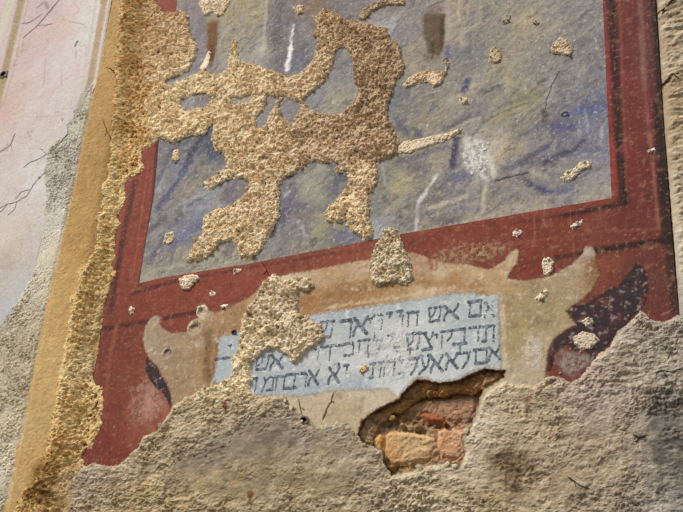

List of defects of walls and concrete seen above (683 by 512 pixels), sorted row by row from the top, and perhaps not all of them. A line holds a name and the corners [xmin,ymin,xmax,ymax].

crack [0,127,68,215]
spalling [0,0,462,512]
spalling [68,274,683,512]